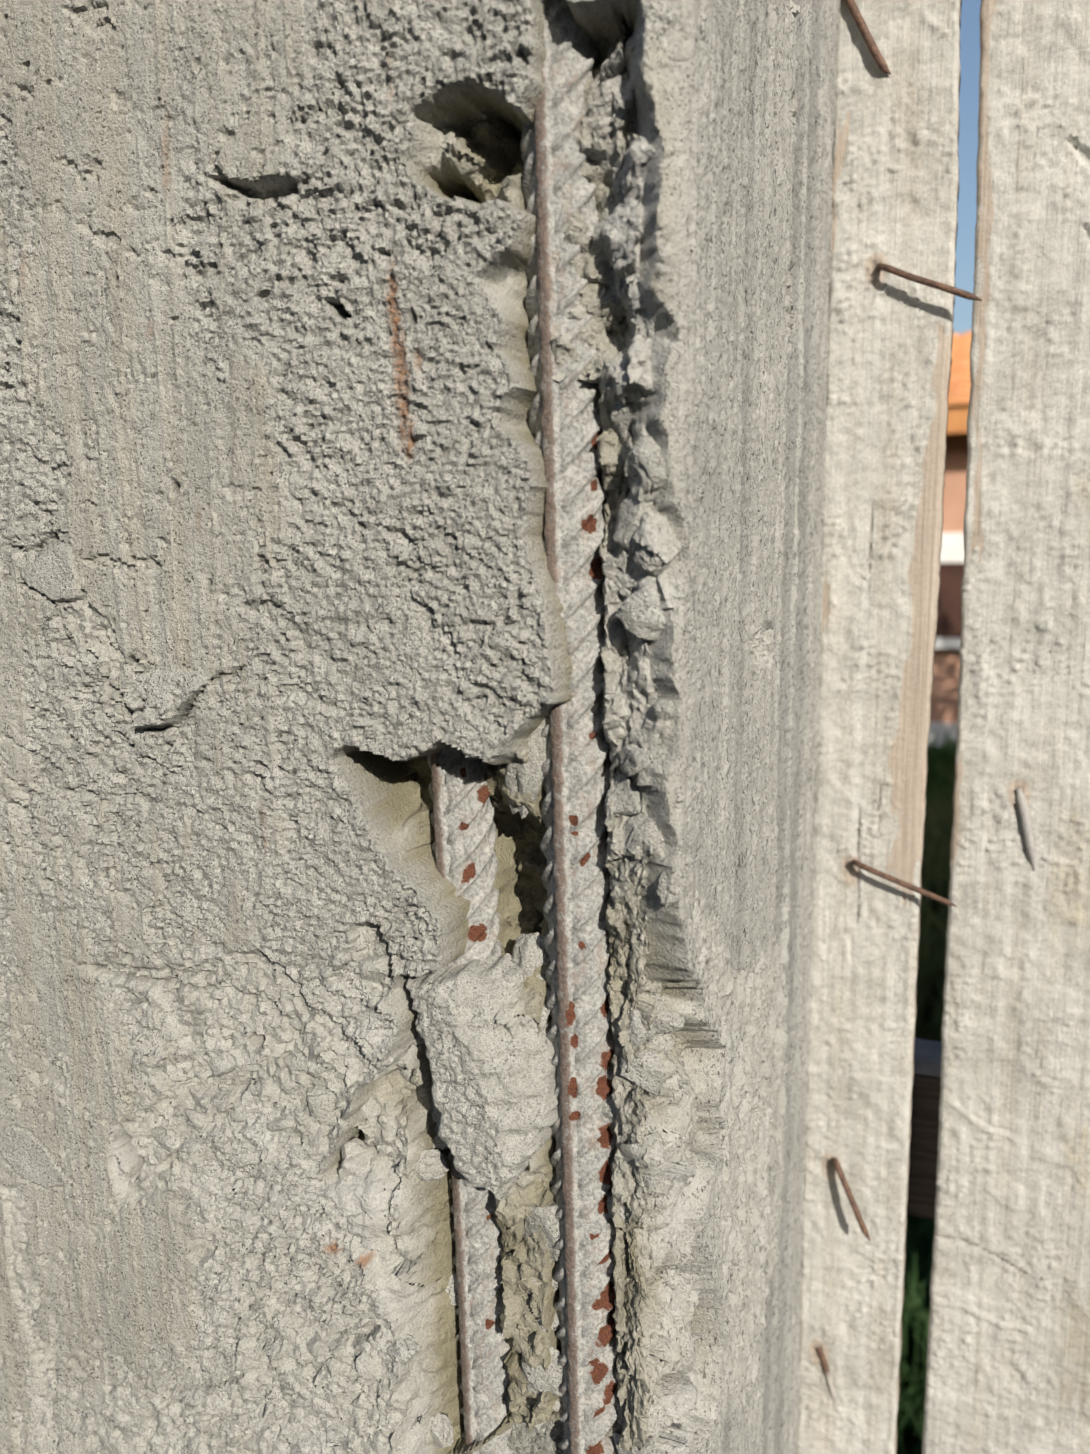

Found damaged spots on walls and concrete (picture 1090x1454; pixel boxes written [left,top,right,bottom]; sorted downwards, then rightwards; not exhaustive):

peeling [785,263,796,355]
corrosion [384,252,424,472]
corrosion [590,429,601,454]
corrosion [579,515,604,581]
spalling [0,0,790,1454]
corrosion [459,766,491,833]
corrosion [462,860,480,887]
corrosion [467,920,494,956]
corrosion [599,994,611,1021]
corrosion [569,1047,615,1125]
corrosion [589,1122,619,1419]
corrosion [584,1438,617,1454]